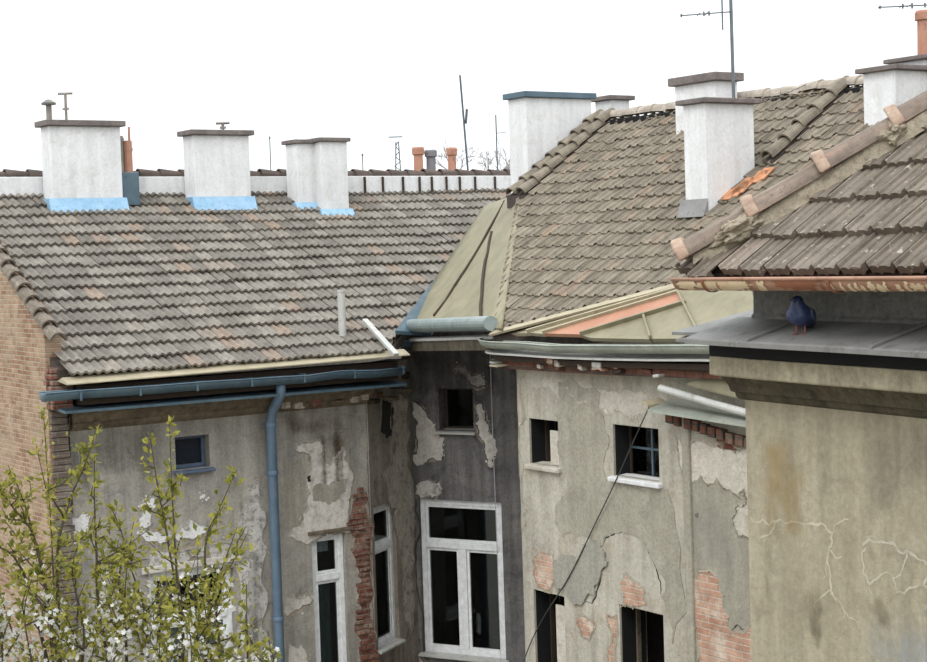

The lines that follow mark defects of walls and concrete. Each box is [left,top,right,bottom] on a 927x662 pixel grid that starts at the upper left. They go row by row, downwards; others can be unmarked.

peeling [451,361,498,471]
peeling [136,479,273,662]
peeling [281,439,379,662]
peeling [380,392,446,662]
flaking render [532,546,554,594]
peeling [676,432,749,540]
flaking render [694,569,752,662]
crack [750,517,927,628]